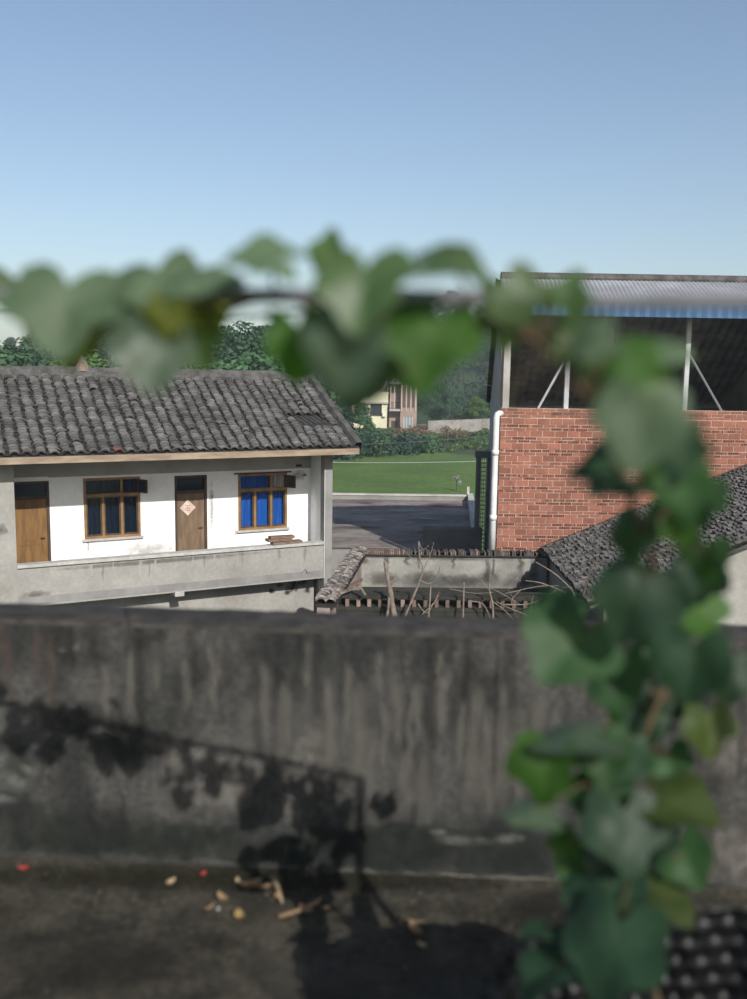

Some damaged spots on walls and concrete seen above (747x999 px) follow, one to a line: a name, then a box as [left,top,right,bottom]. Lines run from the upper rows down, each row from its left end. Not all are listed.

leakage [247,669,290,778]
leakage [325,655,431,814]
leakage [436,654,449,731]
leakage [456,687,508,812]
leakage [151,827,538,866]